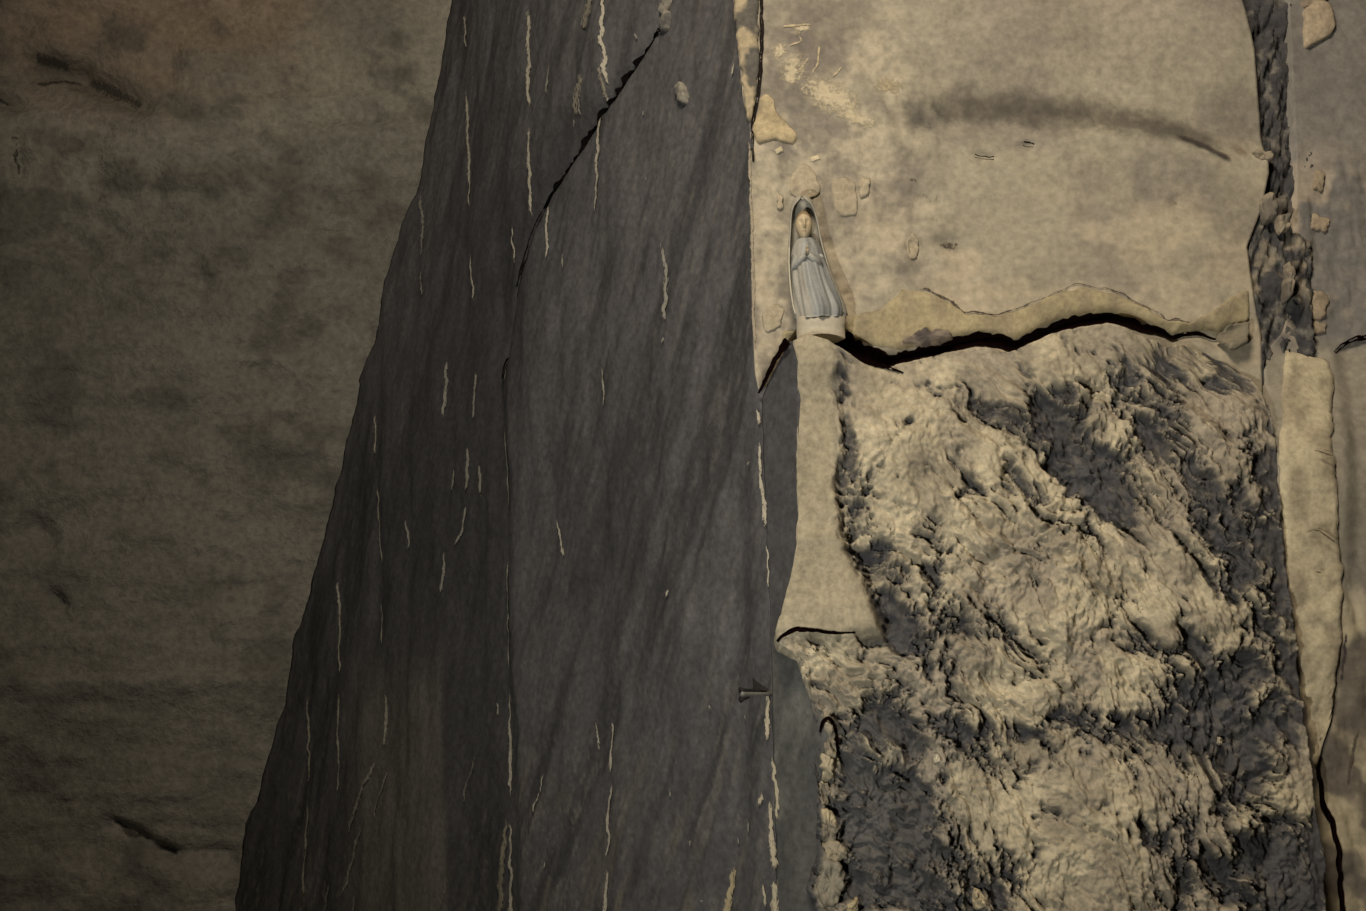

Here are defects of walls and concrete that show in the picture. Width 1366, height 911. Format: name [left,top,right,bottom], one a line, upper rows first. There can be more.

peeling [1300,0,1336,49]
crack [516,7,670,294]
peeling [1311,213,1330,233]
crack [758,336,797,394]
crack [834,313,1216,373]
spalling [762,283,1343,911]
crack [776,626,855,642]